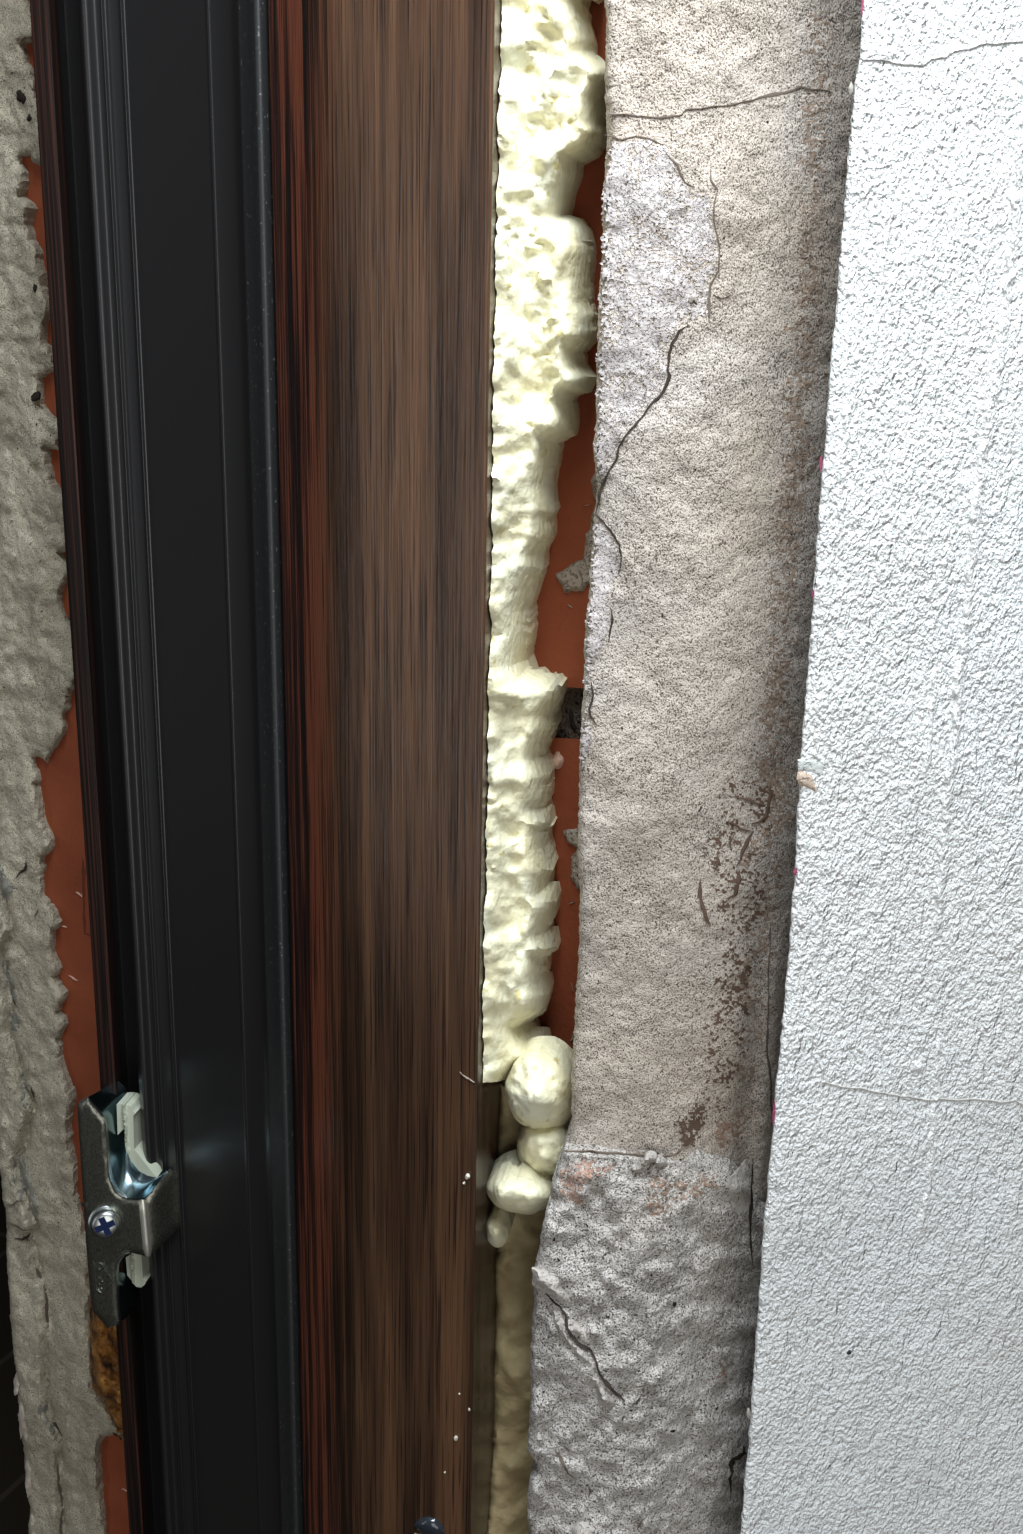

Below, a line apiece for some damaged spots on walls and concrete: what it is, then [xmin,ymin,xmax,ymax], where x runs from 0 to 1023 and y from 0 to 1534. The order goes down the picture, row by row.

crack [858,41,1023,66]
flaking render [593,137,719,485]
crack [593,86,831,569]
crack [607,609,615,639]
crack [588,682,597,724]
crack [826,1082,1023,1105]
crack [546,1294,641,1405]